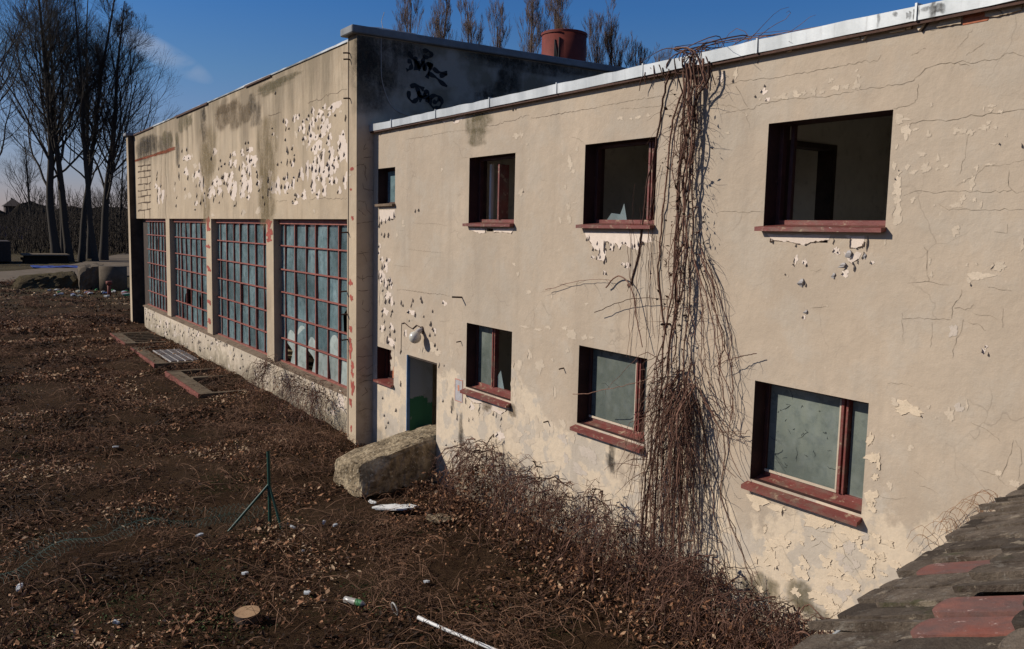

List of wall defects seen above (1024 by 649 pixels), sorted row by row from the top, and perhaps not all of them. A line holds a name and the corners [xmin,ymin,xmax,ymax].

damp [140,73,295,217]
peeling [138,100,354,242]
crack [710,26,1022,233]
peeling [892,113,949,225]
peeling [378,209,554,447]
peeling [585,232,652,275]
peeling [767,234,875,287]
crack [901,265,1011,358]
peeling [891,397,969,422]
peeling [746,492,785,514]
peeling [863,432,893,513]
peeling [754,514,902,618]